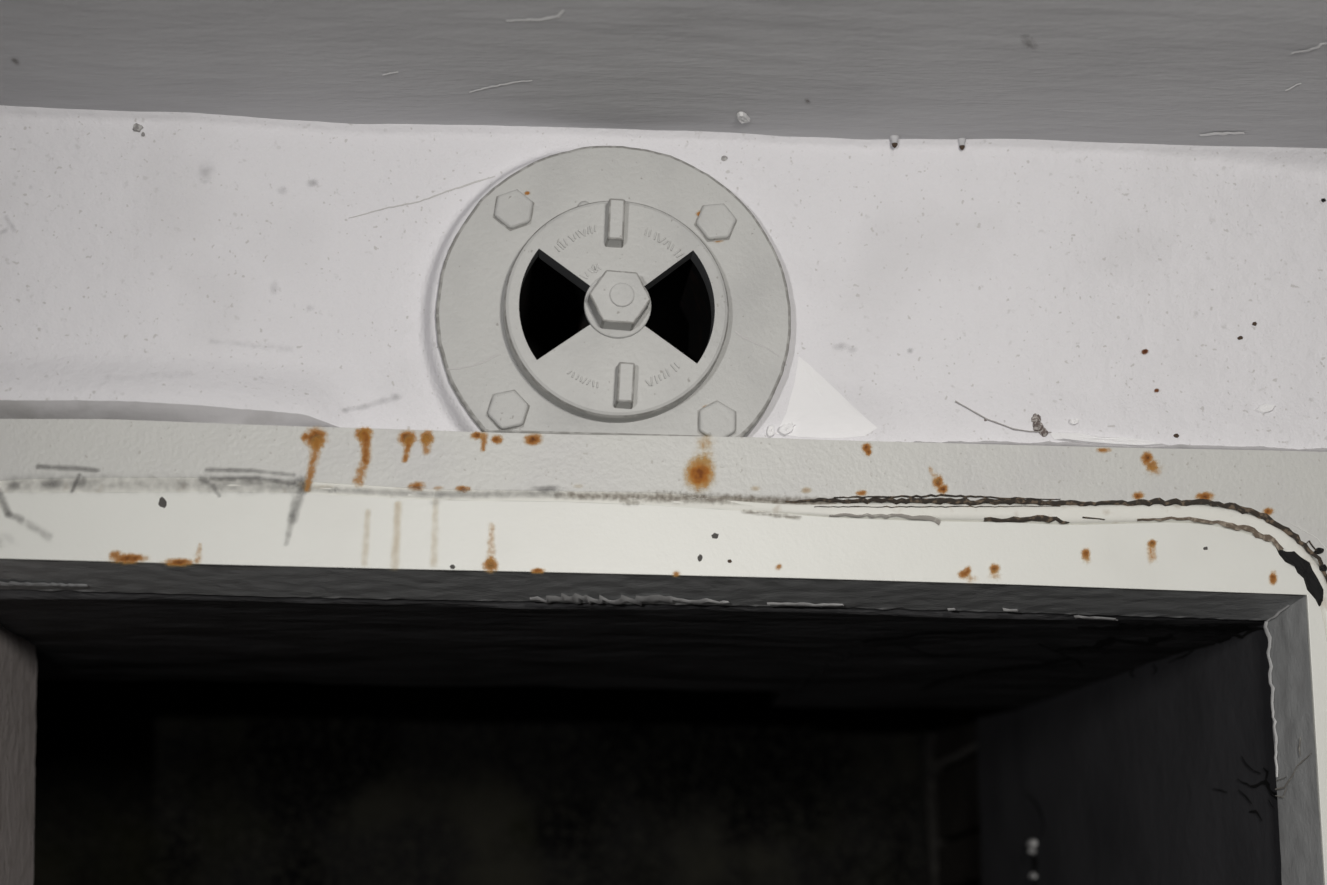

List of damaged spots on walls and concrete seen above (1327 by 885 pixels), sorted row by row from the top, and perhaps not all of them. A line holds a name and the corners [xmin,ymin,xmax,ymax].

rust [301,428,325,491]
rust [354,428,372,483]
rust [400,431,433,462]
rust [471,432,502,451]
rust [525,434,540,445]
rust [686,458,714,490]
rust [933,477,947,494]
rust [1141,452,1157,470]
crack [785,494,1327,581]
rust [110,551,143,563]
rust [484,556,497,571]
crack [1213,737,1312,821]